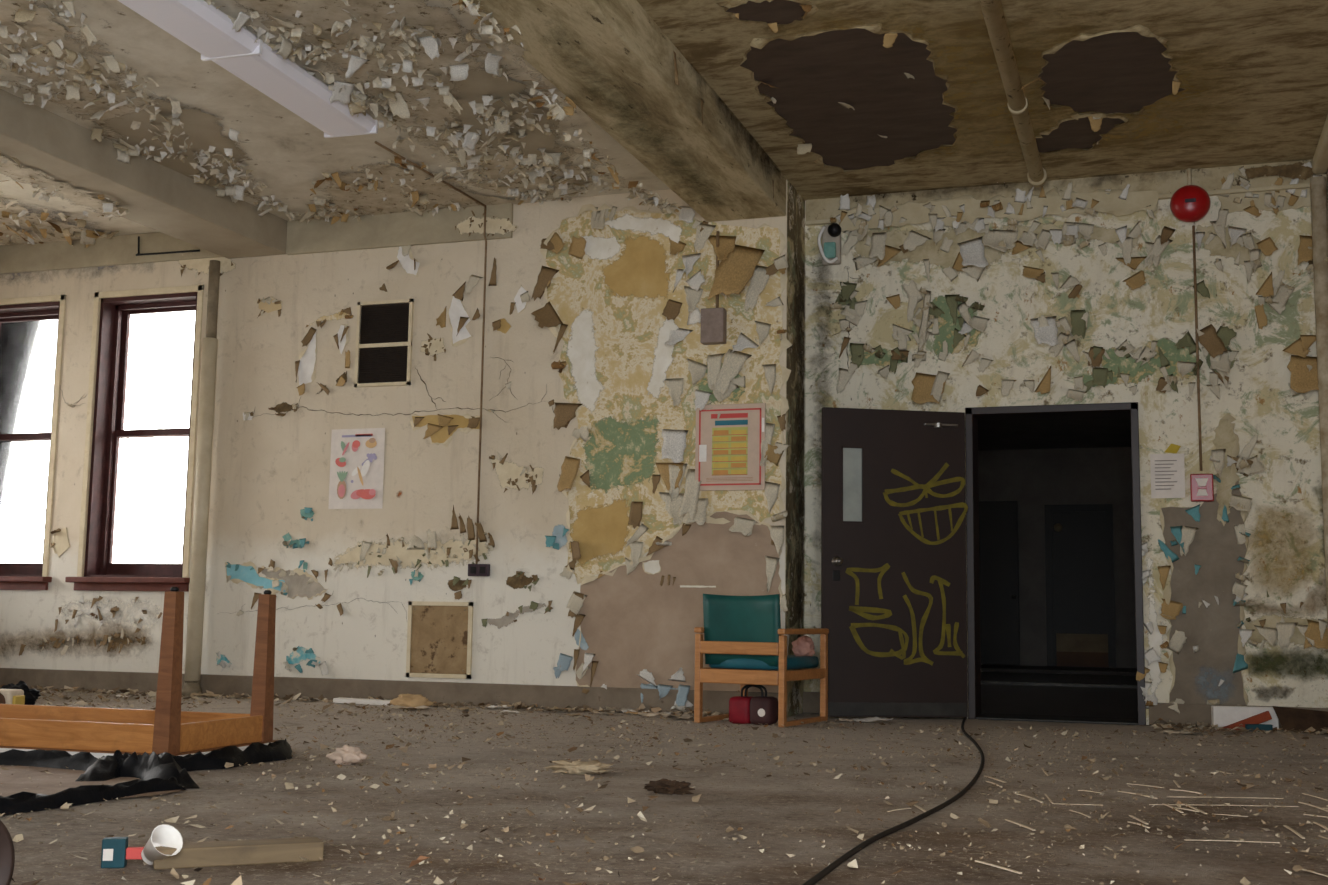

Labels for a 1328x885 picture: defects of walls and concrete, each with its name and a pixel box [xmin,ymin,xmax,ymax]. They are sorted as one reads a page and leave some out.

flaking render [716,0,958,172]
flaking render [1021,24,1186,154]
peeling [0,0,792,712]
peeling [829,182,1239,404]
peeling [1196,161,1322,329]
peeling [1282,335,1319,399]
peeling [1136,413,1328,714]
leakage [1246,511,1327,628]
leakage [1247,651,1328,698]